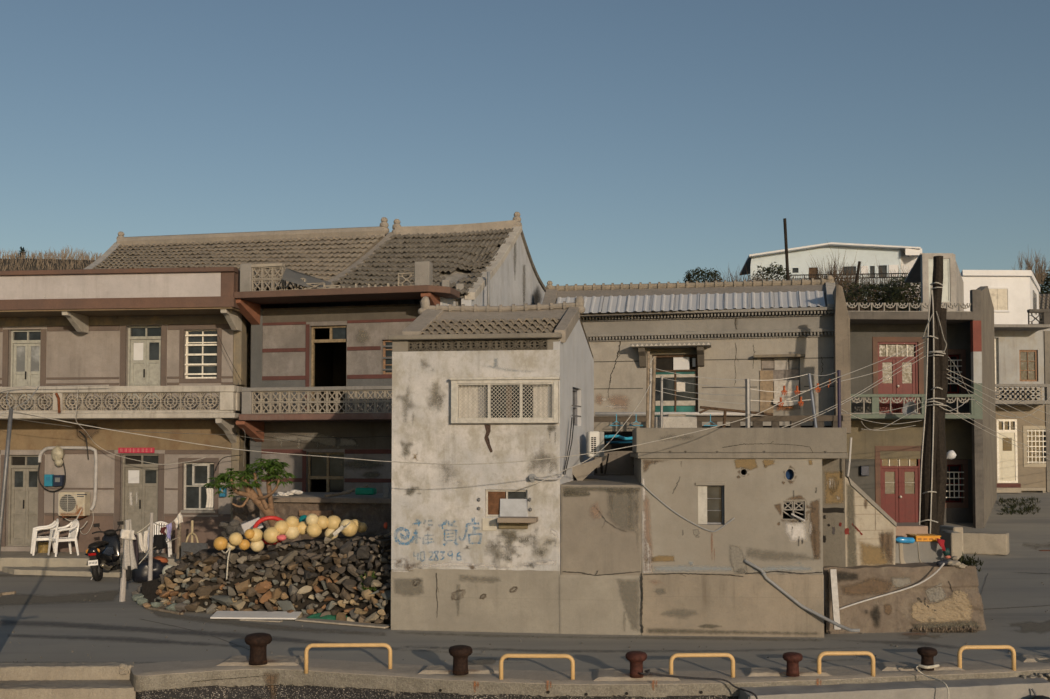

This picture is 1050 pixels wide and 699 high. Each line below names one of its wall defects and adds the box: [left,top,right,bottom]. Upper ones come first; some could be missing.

crack [608,341,621,396]
water stain [484,425,493,452]
spalling [843,578,911,615]
spalling [912,584,972,623]